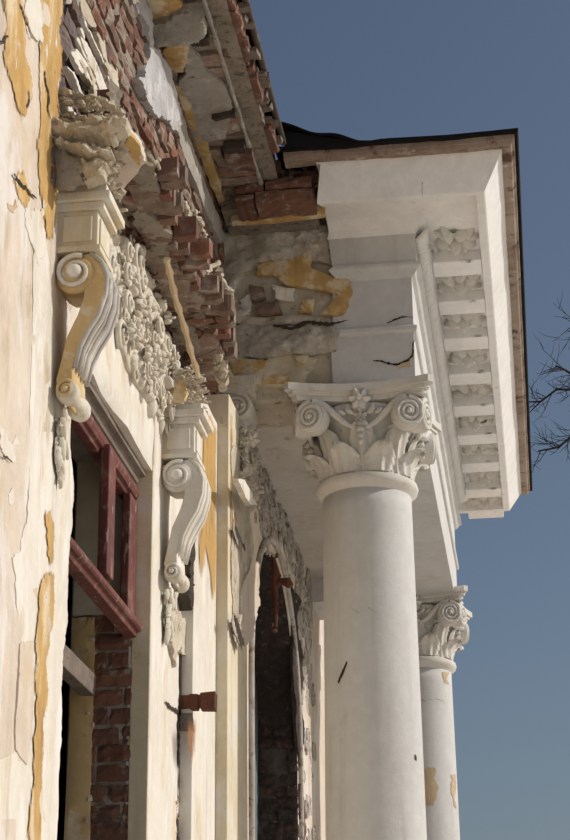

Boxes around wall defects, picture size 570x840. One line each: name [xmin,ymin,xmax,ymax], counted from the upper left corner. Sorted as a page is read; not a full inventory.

crack [373,316,415,369]
peeling [0,0,353,840]
peeling [424,767,439,806]